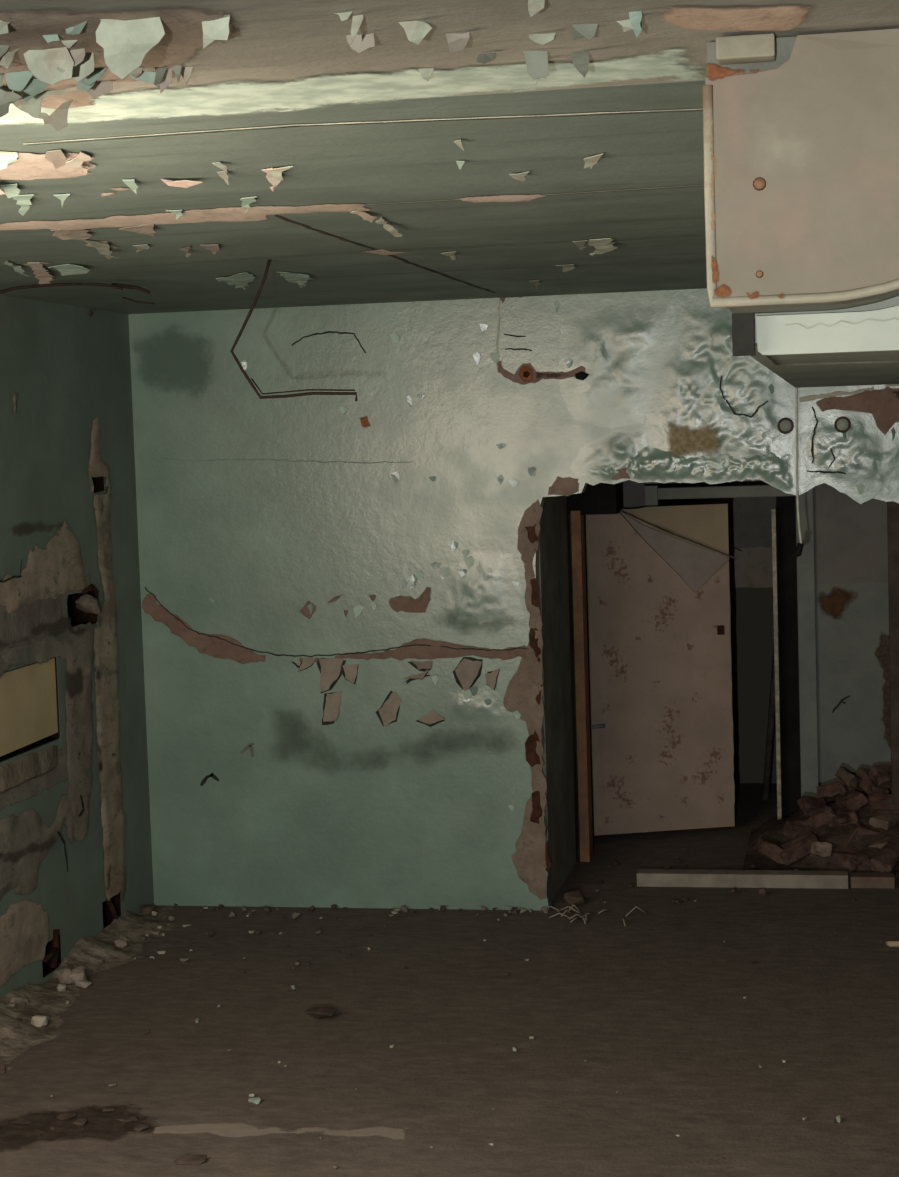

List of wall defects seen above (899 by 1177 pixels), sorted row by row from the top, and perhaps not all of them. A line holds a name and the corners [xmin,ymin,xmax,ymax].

peeling [528,0,545,17]
spalling [662,6,809,31]
peeling [0,8,702,131]
rust [706,63,758,81]
peeling [0,150,402,259]
peeling [4,261,90,284]
rust [711,256,731,298]
rust [496,297,589,385]
spalling [799,384,899,441]
spalling [0,416,126,986]
spalling [142,477,579,900]
spalling [31,1015,49,1027]